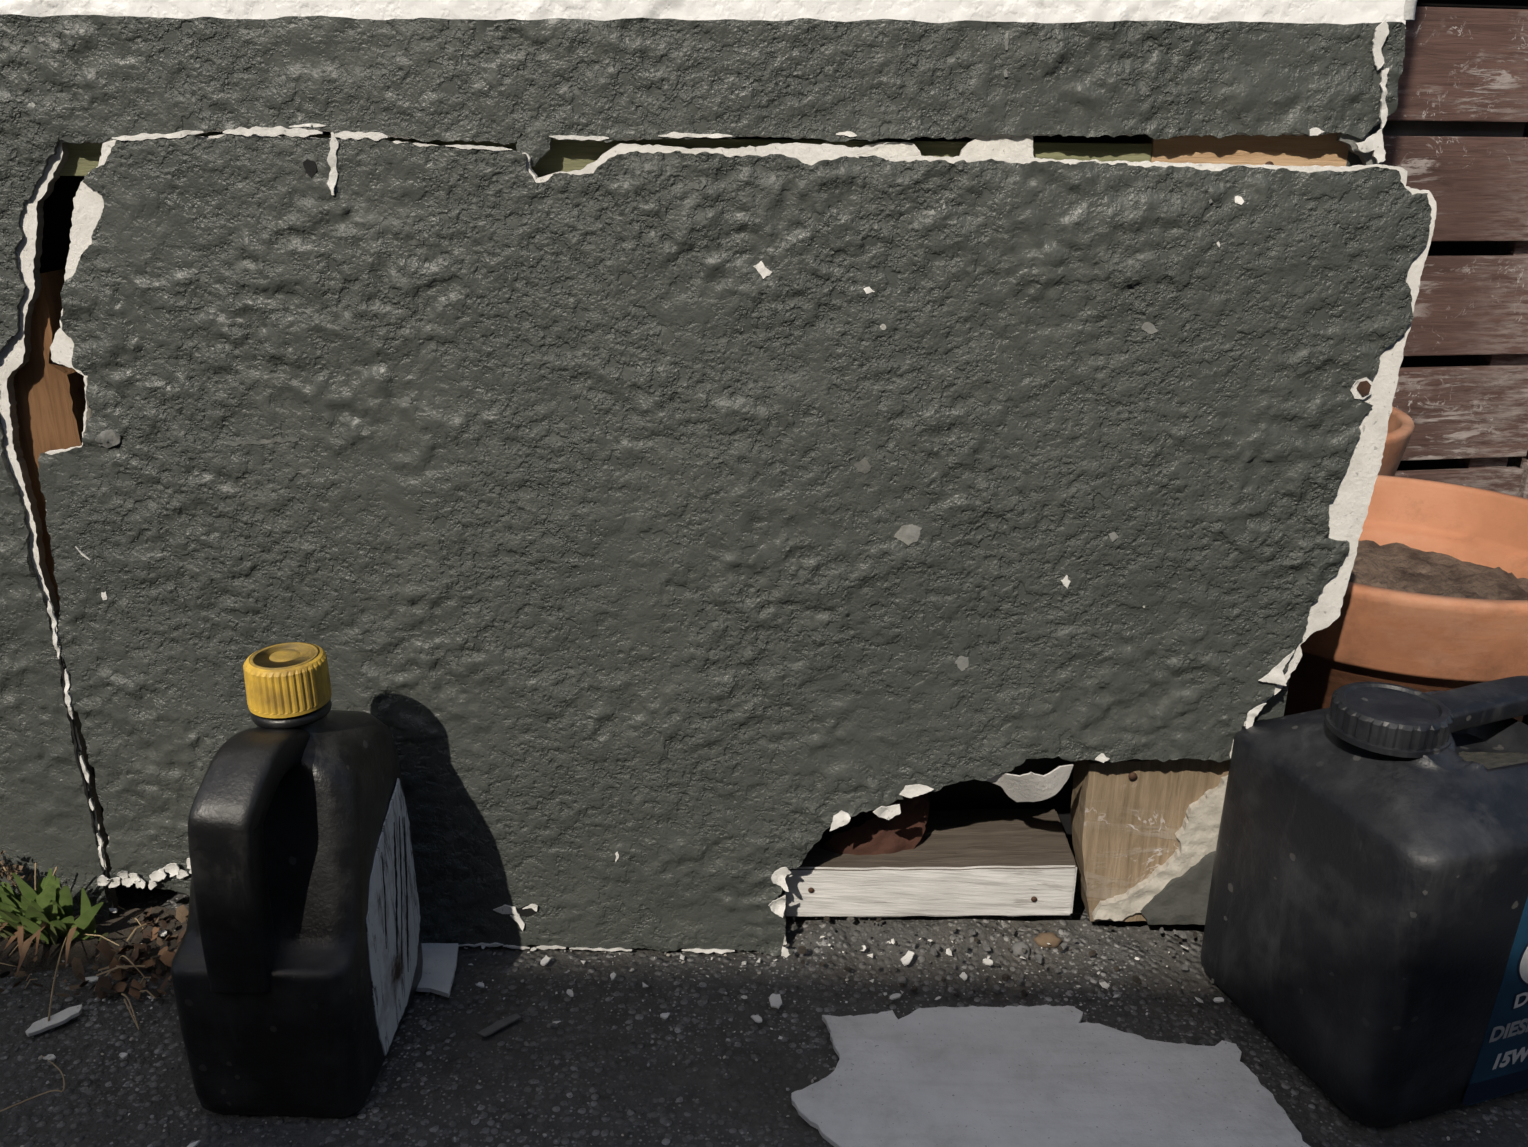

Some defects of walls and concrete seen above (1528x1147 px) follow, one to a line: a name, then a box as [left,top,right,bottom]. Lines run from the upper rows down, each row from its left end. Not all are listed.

crack [112,123,388,195]
crack [445,144,513,152]
crack [549,134,609,142]
crack [658,131,732,139]
crack [836,131,921,158]
crack [959,134,1034,159]
spalling [1258,650,1295,686]
spalling [1245,703,1266,729]
crack [47,600,106,875]
spalling [873,784,934,820]
spalling [830,810,851,831]
spalling [768,867,791,918]